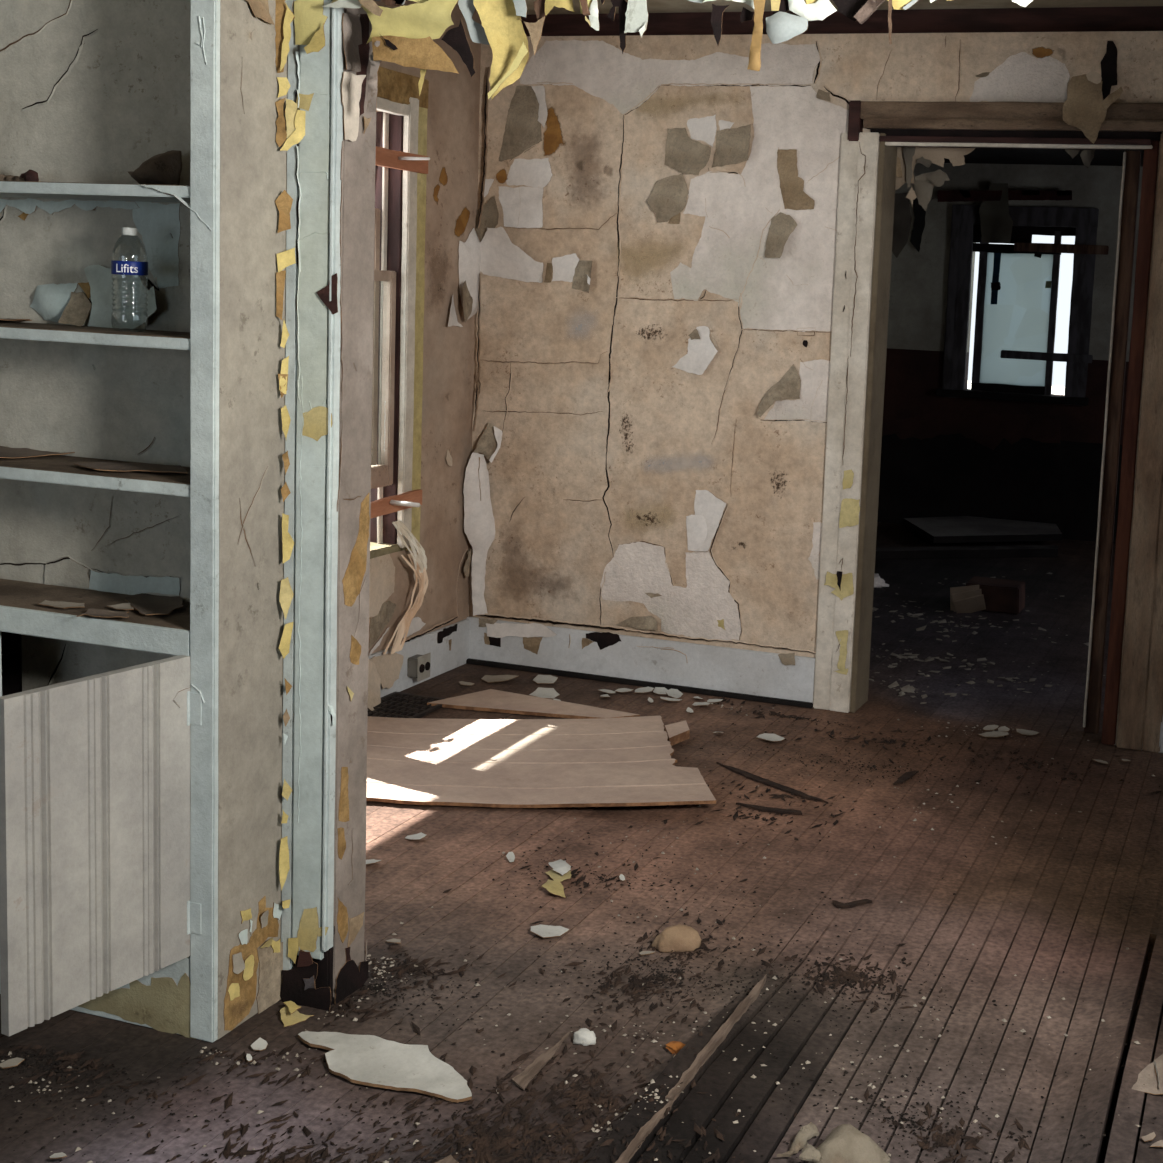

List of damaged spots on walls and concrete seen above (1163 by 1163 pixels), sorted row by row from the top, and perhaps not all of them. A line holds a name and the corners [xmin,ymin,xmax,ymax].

crack [0,0,98,111]
peeling [888,0,950,10]
crack [945,36,961,102]
peeling [970,52,1070,102]
peeling [245,0,849,332]
peeling [0,198,181,329]
peeling [276,248,333,563]
crack [401,41,893,660]
peeling [279,577,294,659]
spalling [479,618,557,654]
peeling [582,490,741,650]
spalling [224,767,364,1031]